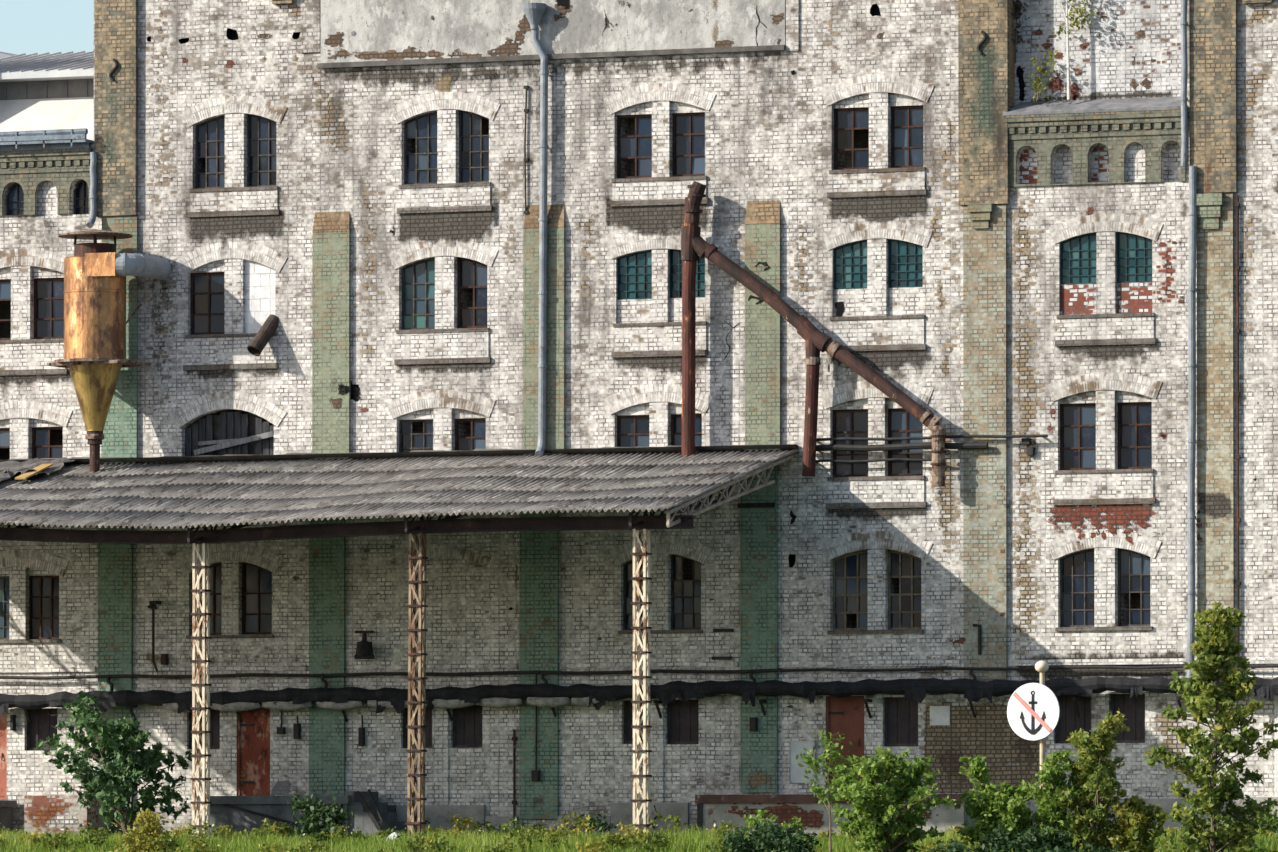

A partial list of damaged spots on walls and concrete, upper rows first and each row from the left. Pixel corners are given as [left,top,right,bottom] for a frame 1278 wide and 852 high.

spalling [1014,0,1064,59]
peeling [293,15,531,153]
spalling [1016,50,1025,101]
spalling [1048,70,1088,100]
spalling [1126,29,1156,90]
peeling [1007,192,1156,654]
spalling [726,803,824,832]